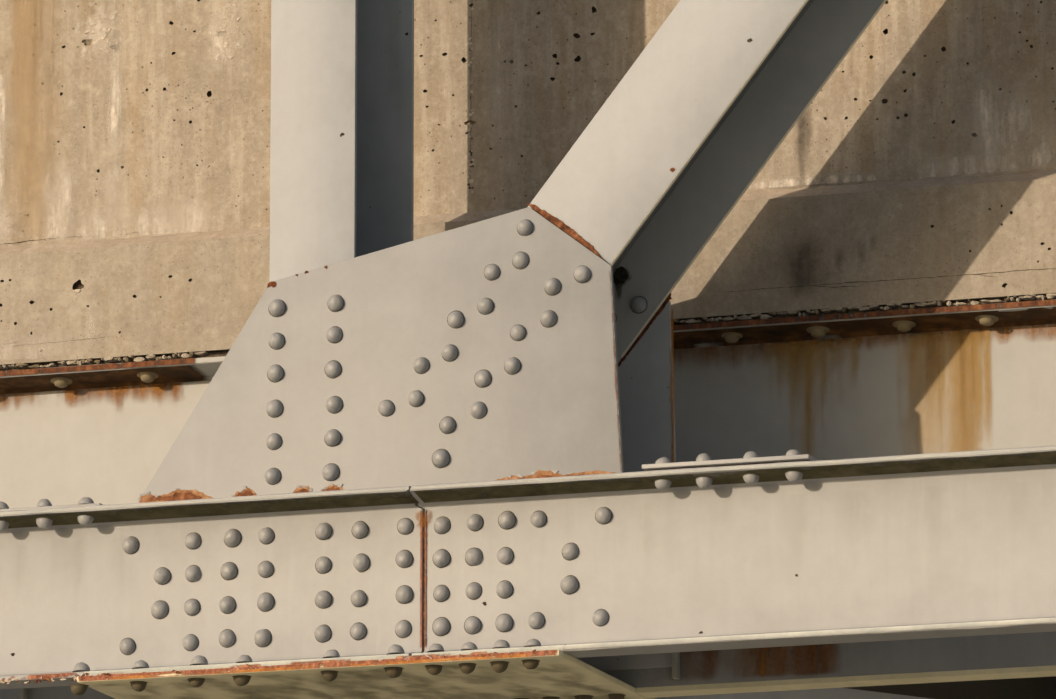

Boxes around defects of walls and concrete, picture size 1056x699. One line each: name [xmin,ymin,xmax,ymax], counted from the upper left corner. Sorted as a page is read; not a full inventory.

rust [526,202,605,261]
crack [730,268,1052,292]
rust [0,358,205,405]
rust [612,293,1056,463]
rust [0,511,557,685]